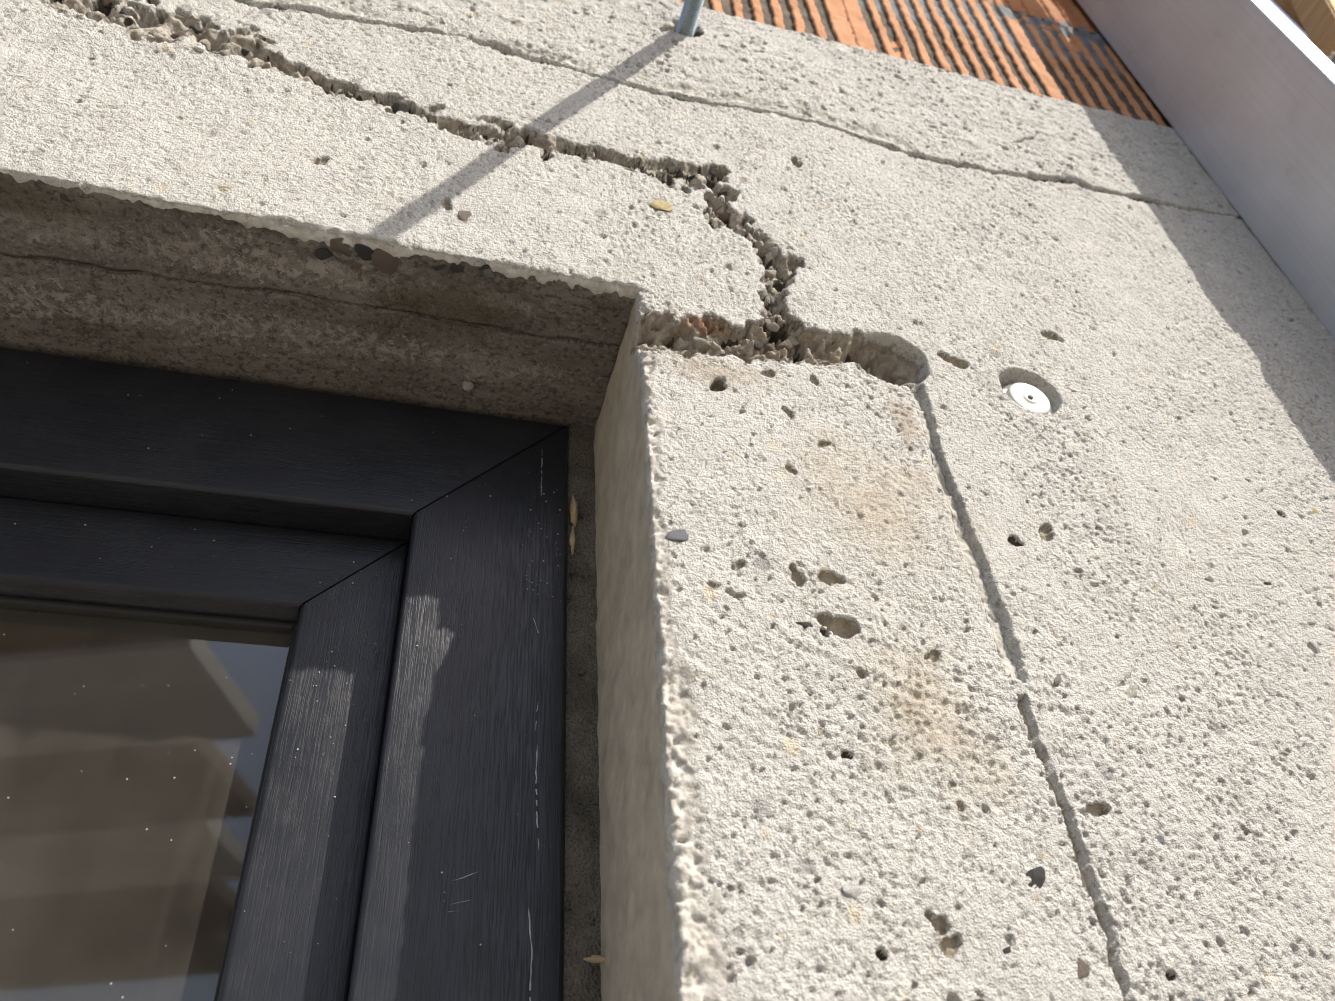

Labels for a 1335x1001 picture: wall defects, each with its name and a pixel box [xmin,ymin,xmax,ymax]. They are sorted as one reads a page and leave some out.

crack [240,0,308,13]
crack [342,5,383,19]
crack [411,24,595,70]
crack [633,77,977,170]
spalling [0,0,922,1001]
crack [912,393,1126,1001]